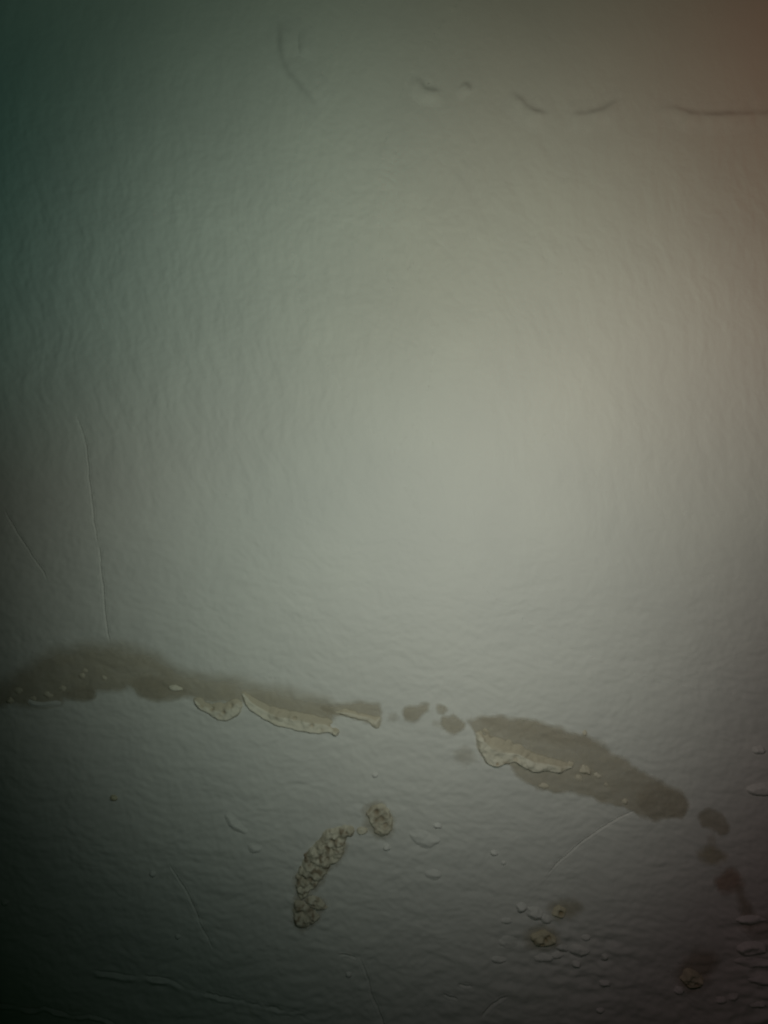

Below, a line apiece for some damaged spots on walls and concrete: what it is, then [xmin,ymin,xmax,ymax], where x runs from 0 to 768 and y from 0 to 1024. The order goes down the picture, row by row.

water stain [0,650,379,719]
water stain [443,718,686,819]